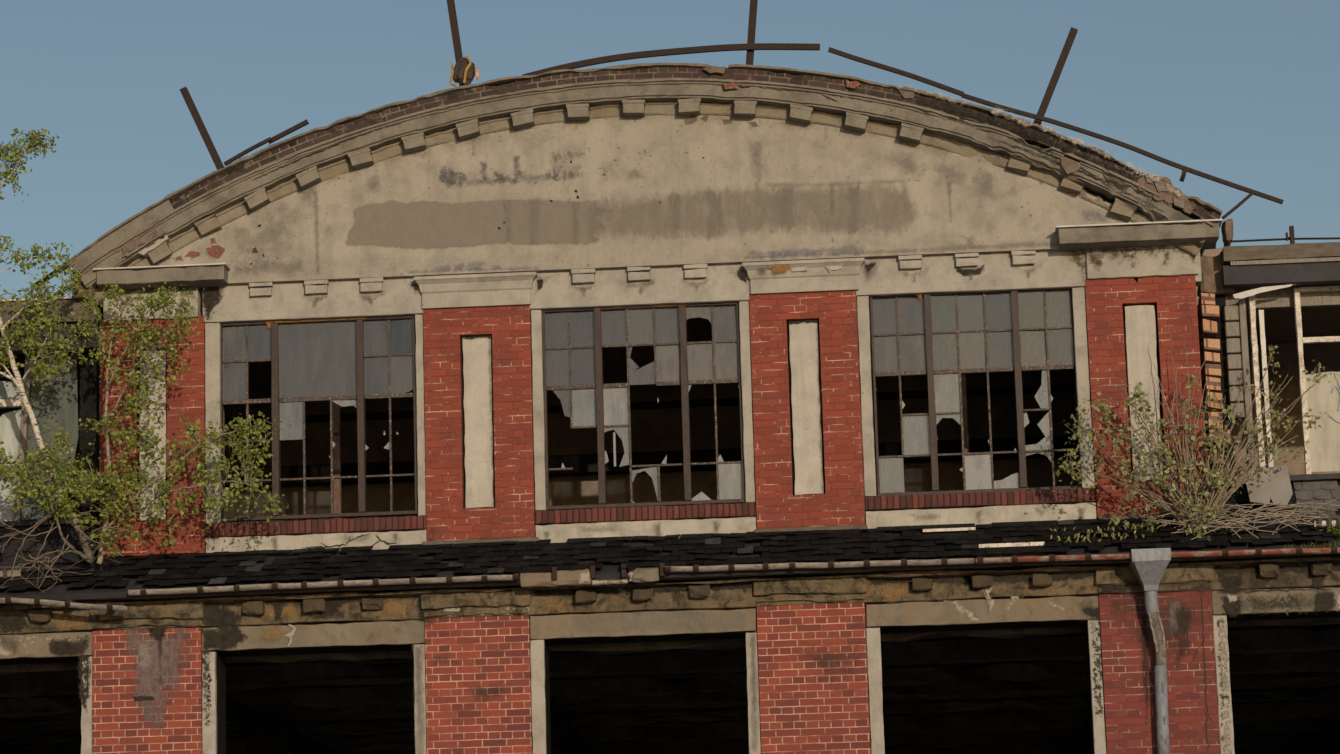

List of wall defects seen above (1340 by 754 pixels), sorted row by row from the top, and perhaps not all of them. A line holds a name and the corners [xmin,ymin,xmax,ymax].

spalling [1137,173,1196,217]
spalling [122,229,170,258]
spalling [173,236,228,262]
damp [579,570,633,596]
damp [946,587,1019,620]
damp [1084,584,1127,641]
damp [1219,574,1243,617]
damp [1315,591,1340,612]
damp [49,616,88,655]
damp [201,624,248,650]
damp [127,618,185,726]
peeling [201,648,212,726]